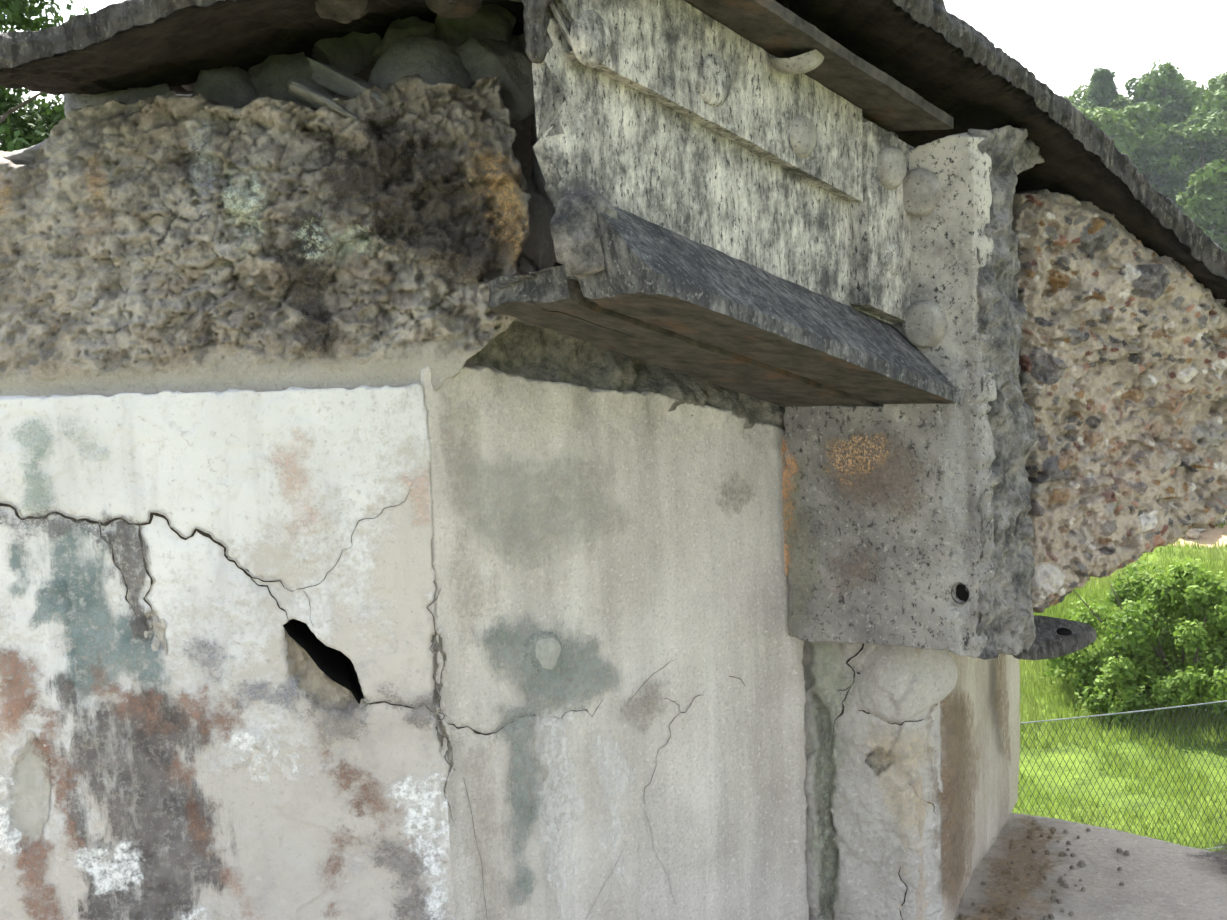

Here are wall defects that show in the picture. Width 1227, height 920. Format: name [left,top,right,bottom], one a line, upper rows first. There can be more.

crack [0,483,413,627]
rust [781,442,798,573]
rust [825,433,888,487]
spalling [1012,189,1227,613]
water stain [0,421,228,920]
water stain [240,675,300,709]
spalling [283,619,455,770]
water stain [484,619,619,903]
peeling [373,835,435,920]